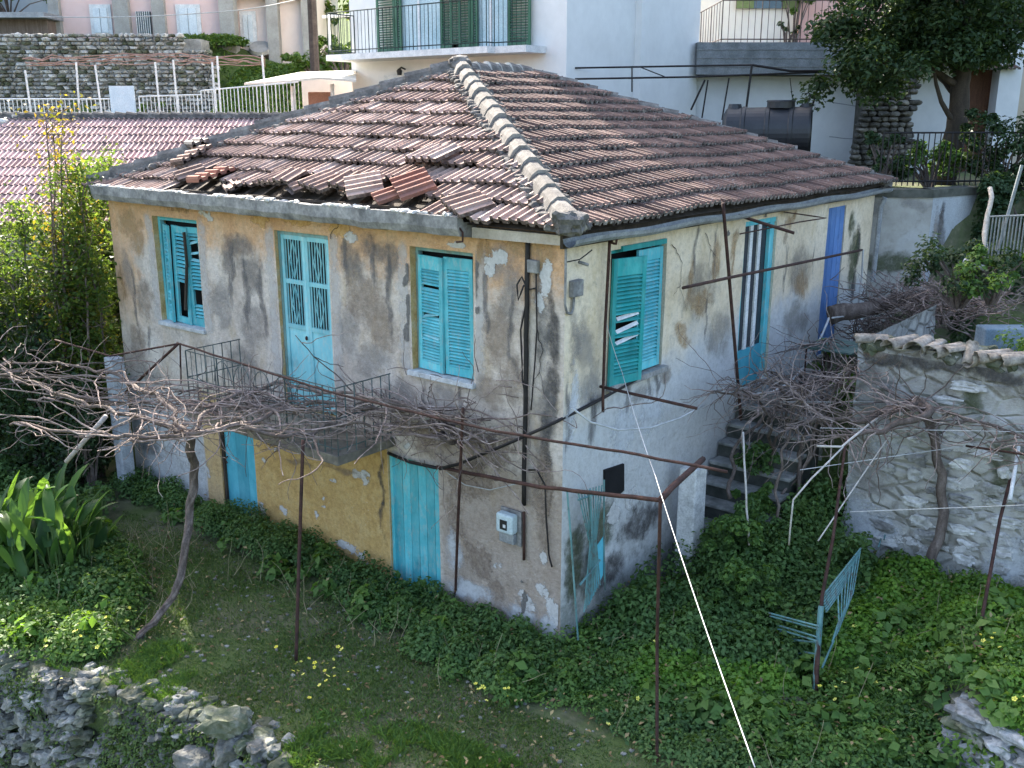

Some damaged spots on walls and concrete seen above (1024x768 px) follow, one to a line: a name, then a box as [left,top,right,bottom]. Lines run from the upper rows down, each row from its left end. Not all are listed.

water stain [224,237,266,332]
water stain [342,240,397,319]
peeling [475,249,508,314]
peeling [535,258,553,313]
peeling [352,469,370,486]
water stain [565,504,658,598]
flaking render [518,583,558,630]